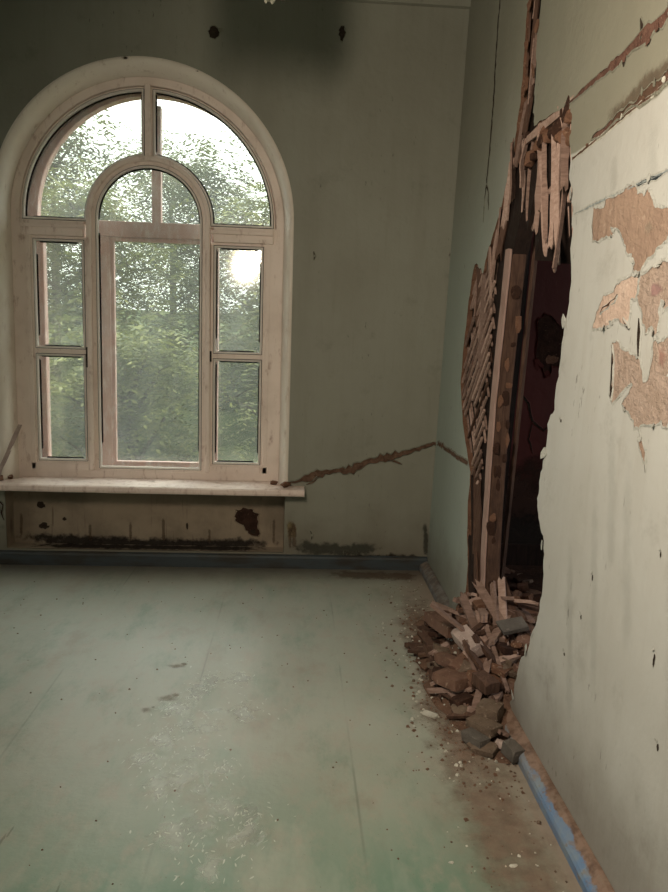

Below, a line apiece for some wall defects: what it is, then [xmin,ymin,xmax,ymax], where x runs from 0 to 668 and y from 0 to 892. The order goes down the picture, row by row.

flaking render [513,0,540,167]
peeling [572,68,668,162]
flaking render [534,312,567,378]
peeling [591,181,668,473]
crack [288,440,468,485]
damp [30,533,265,551]
flaking render [233,506,261,537]
damp [298,527,428,557]